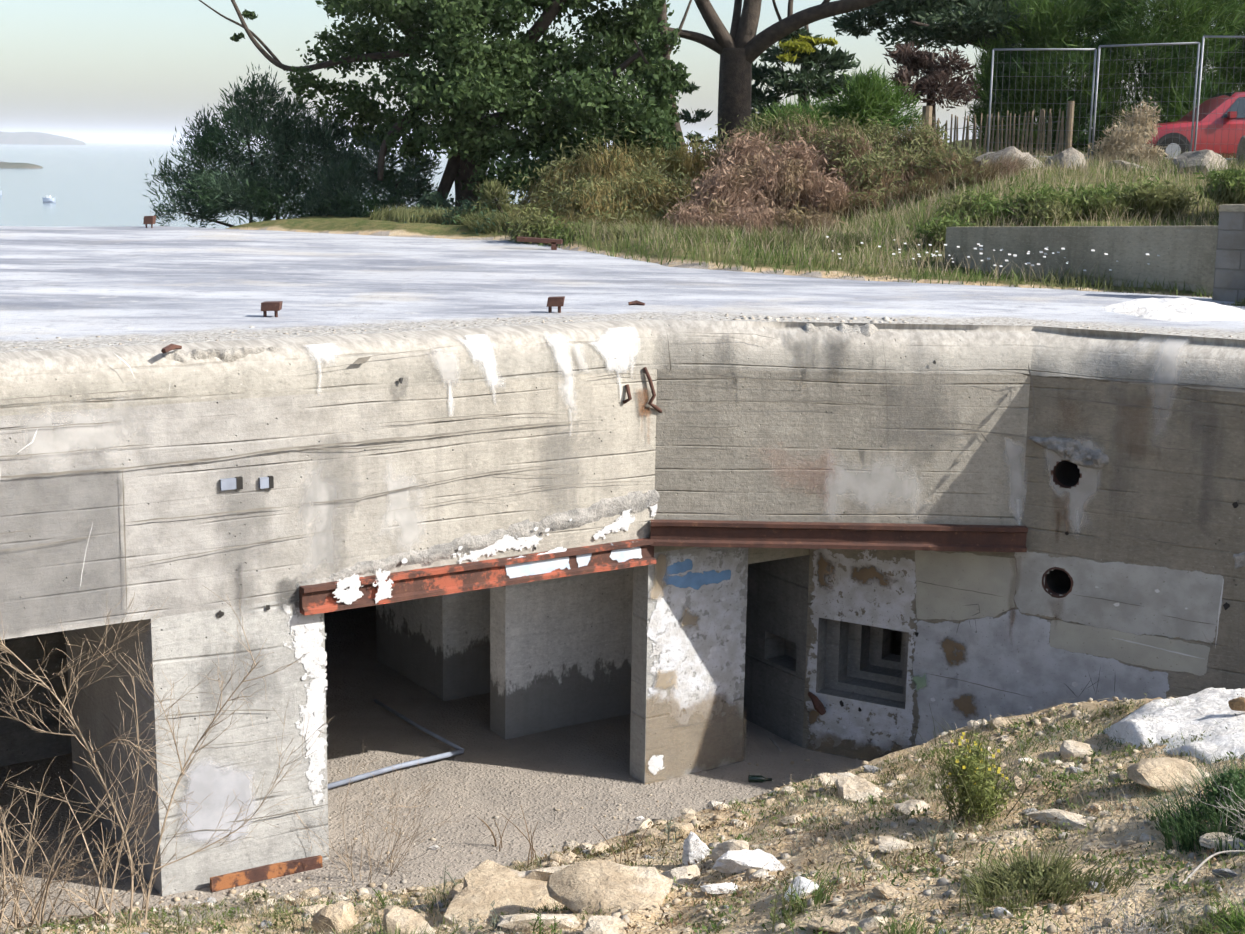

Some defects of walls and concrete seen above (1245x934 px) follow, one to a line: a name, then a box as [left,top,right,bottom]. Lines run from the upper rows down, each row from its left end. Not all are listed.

damp [465,334,500,388]
damp [550,337,573,405]
damp [595,327,638,390]
spalling [295,489,660,592]
peeling [647,548,748,716]
peeling [806,549,1170,752]
peeling [282,604,328,805]